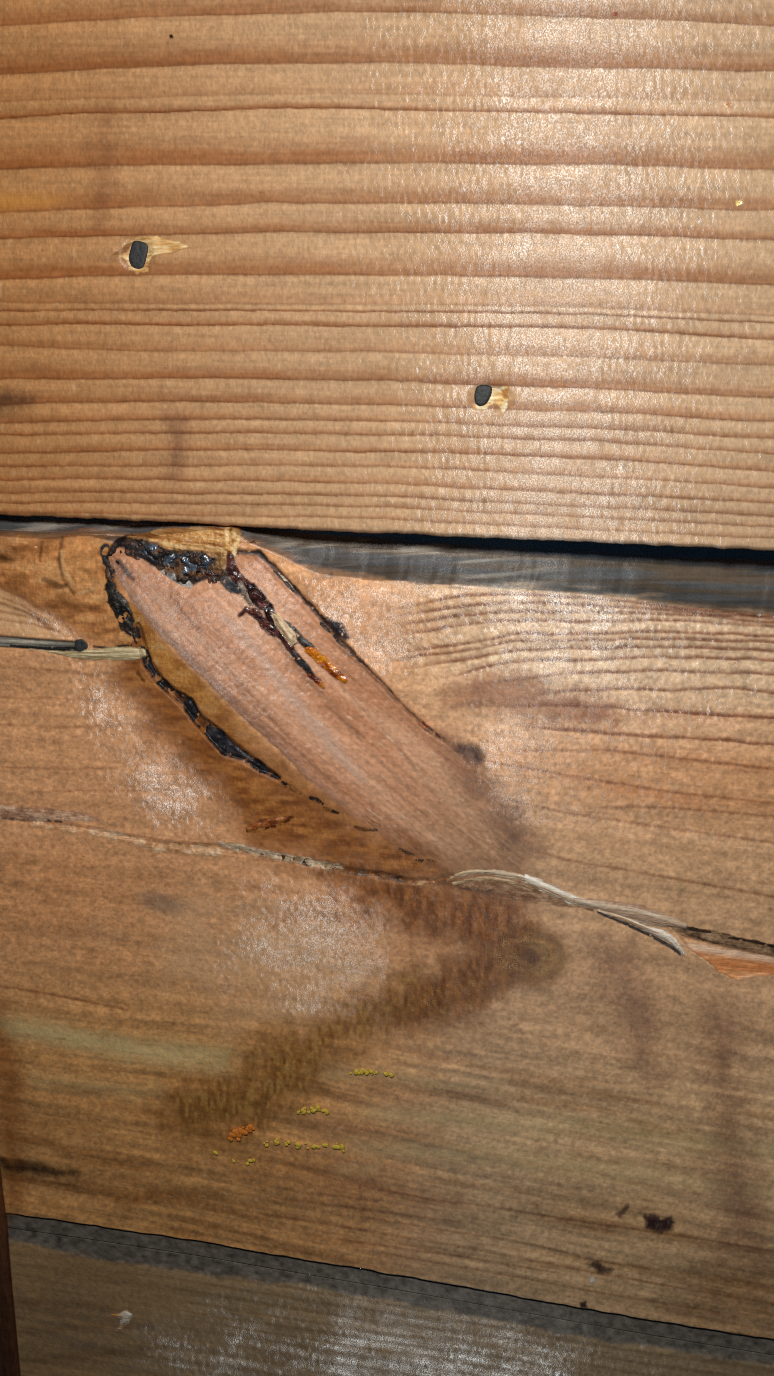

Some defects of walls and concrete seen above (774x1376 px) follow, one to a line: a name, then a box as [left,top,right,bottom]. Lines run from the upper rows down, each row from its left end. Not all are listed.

spalling [100,535,229,588]
leakage [119,637,534,1135]
crack [672,927,774,954]